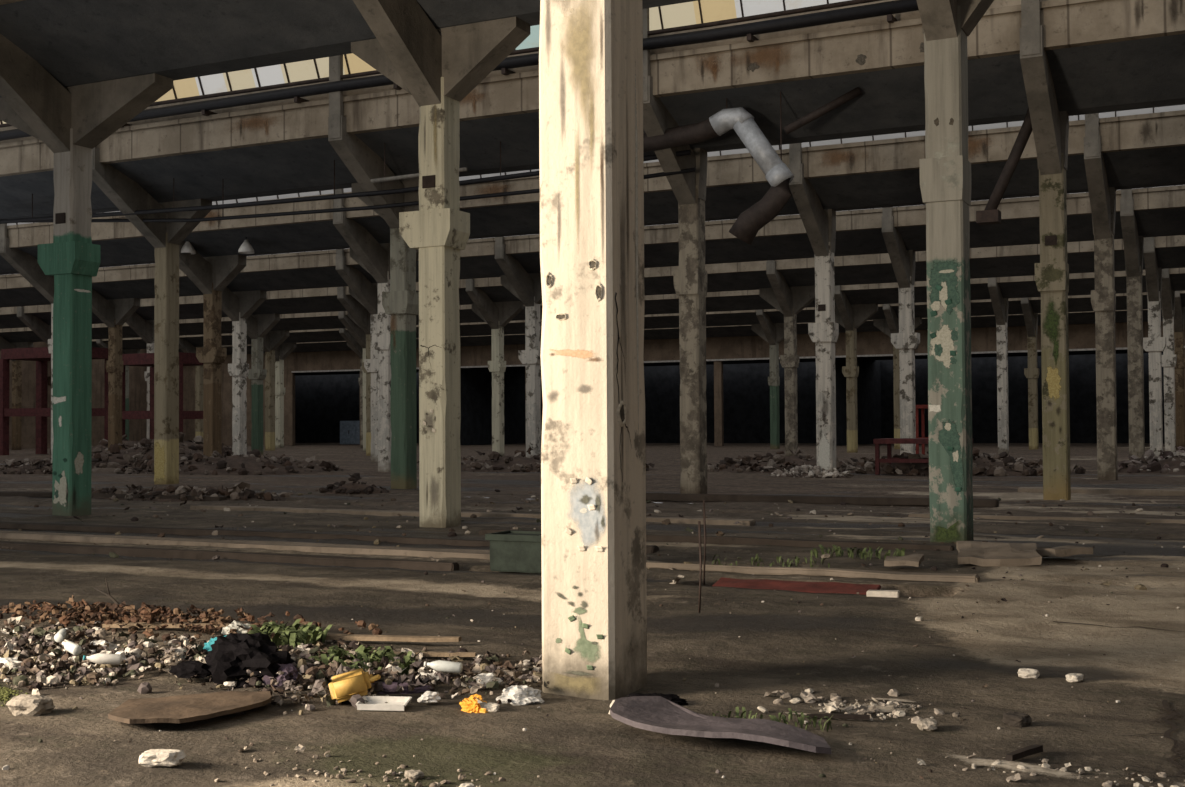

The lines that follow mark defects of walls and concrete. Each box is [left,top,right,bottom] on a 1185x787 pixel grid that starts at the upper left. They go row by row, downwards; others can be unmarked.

damp [560,16,593,223]
peeling [929,261,960,368]
peeling [1046,366,1061,431]
peeling [52,452,84,507]
peeling [565,477,605,552]
peeling [929,405,964,496]
peeling [556,586,604,676]
crack [1053,621,1182,632]